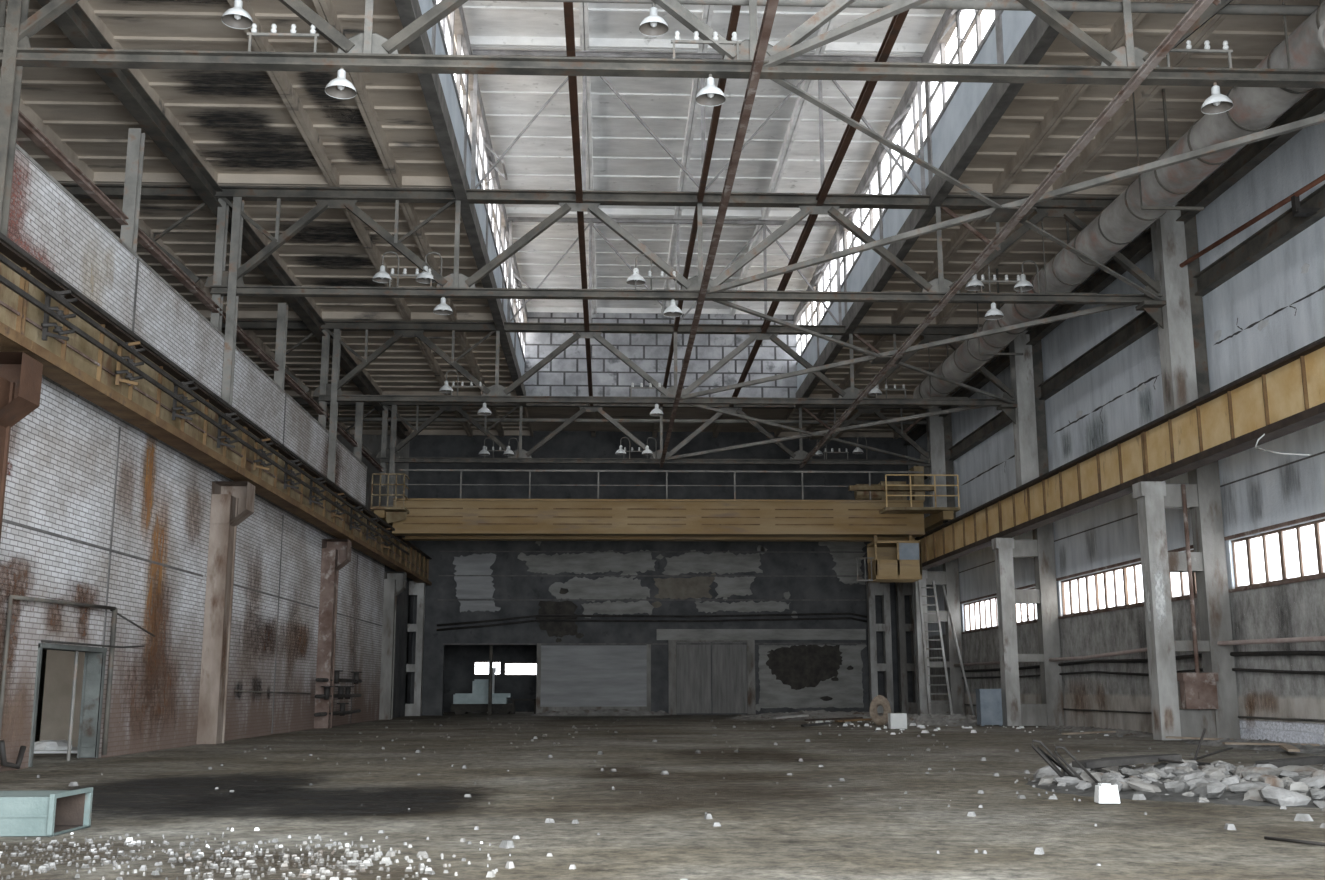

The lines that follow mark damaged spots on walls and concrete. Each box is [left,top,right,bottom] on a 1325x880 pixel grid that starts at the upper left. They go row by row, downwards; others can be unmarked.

damp [171,70,329,171]
damp [300,72,382,165]
rust [127,441,177,730]
flaking render [453,553,501,613]
flaking render [517,541,798,643]
flaking render [756,645,867,711]